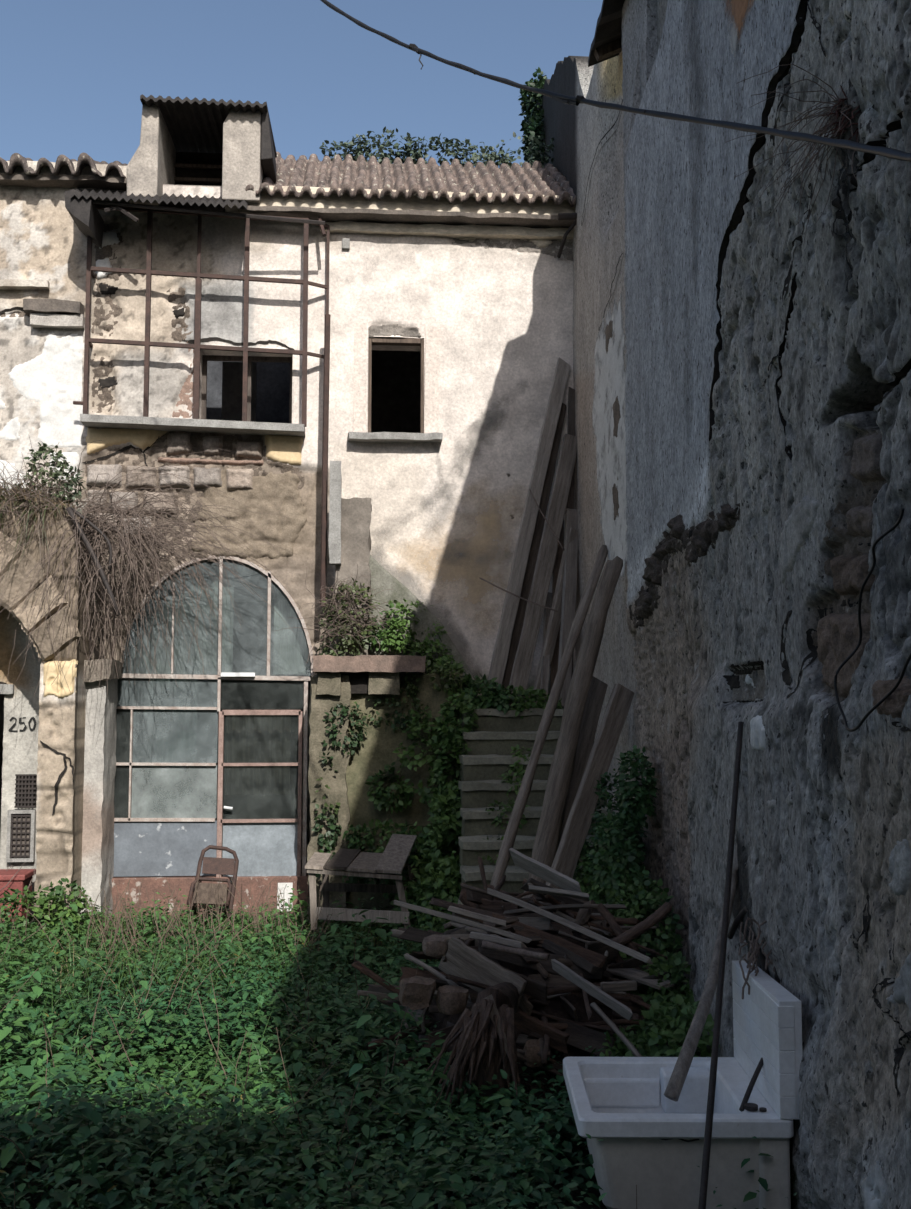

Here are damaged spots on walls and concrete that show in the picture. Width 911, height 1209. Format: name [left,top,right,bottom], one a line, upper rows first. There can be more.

crack [709,0,826,450]
peeling [0,400,20,441]
peeling [0,460,27,494]
spalling [0,307,30,317]
spalling [8,222,307,563]
crack [182,337,294,350]
peeling [592,295,627,576]
spalling [626,503,740,628]
spalling [811,407,887,698]
crack [40,741,74,815]